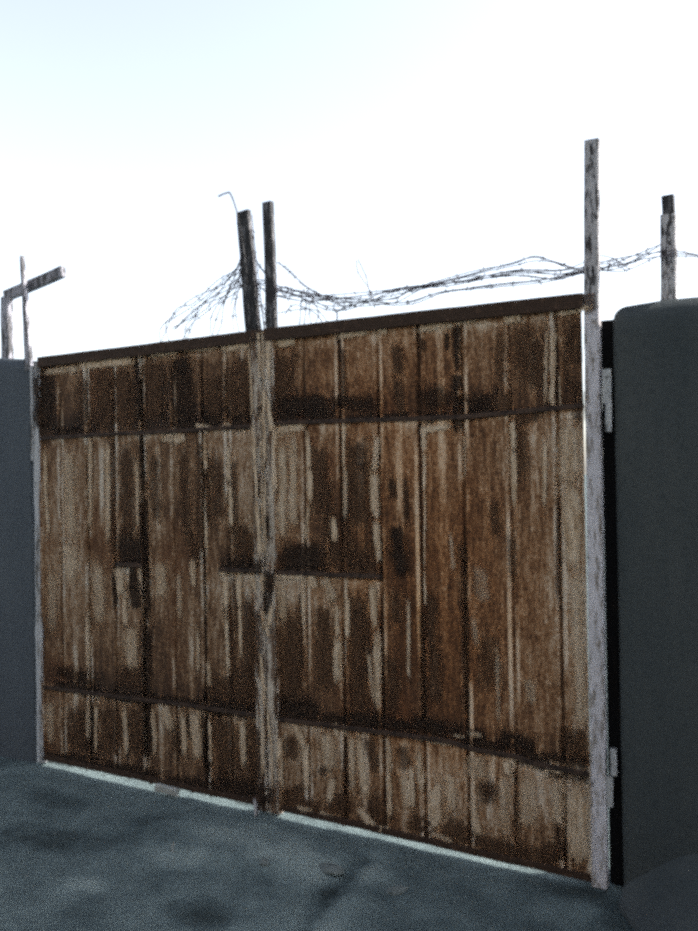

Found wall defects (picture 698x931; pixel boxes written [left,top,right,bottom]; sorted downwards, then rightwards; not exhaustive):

corrosion [271,325,494,433]
corrosion [511,319,587,476]
corrosion [583,293,596,313]
corrosion [32,353,588,865]